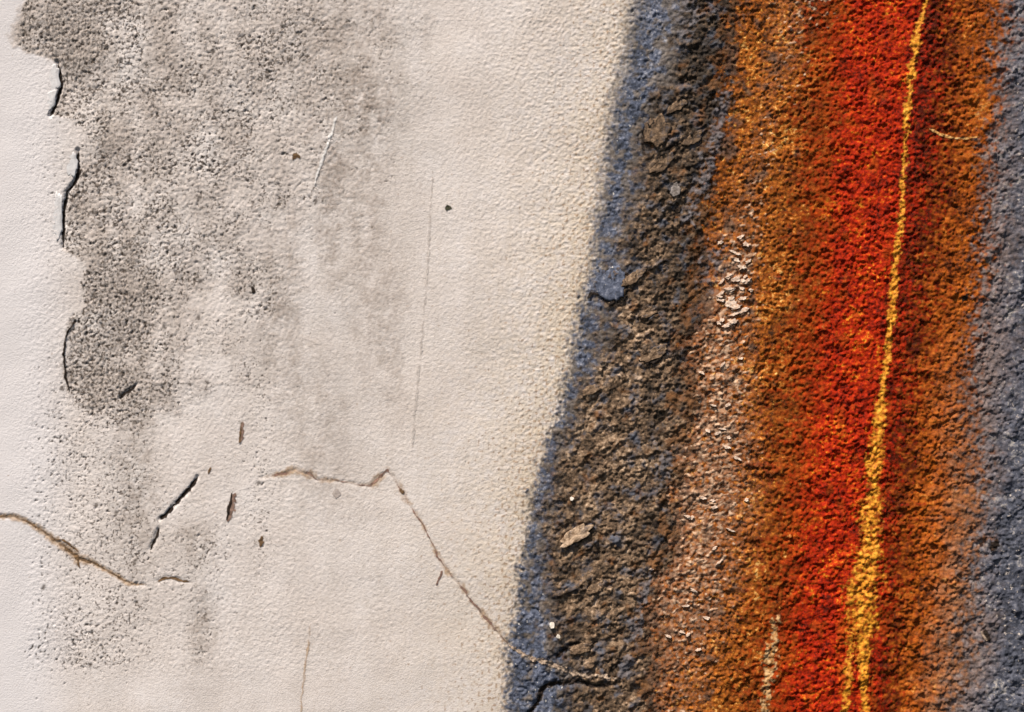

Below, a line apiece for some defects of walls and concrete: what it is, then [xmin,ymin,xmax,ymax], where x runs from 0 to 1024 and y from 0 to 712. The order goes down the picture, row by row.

peeling [47,64,61,112]
peeling [66,149,78,178]
peeling [52,191,63,241]
flaking render [537,0,740,712]
corrosion [636,0,1014,712]
crack [0,514,189,585]
crack [150,467,211,550]
crack [273,468,620,712]